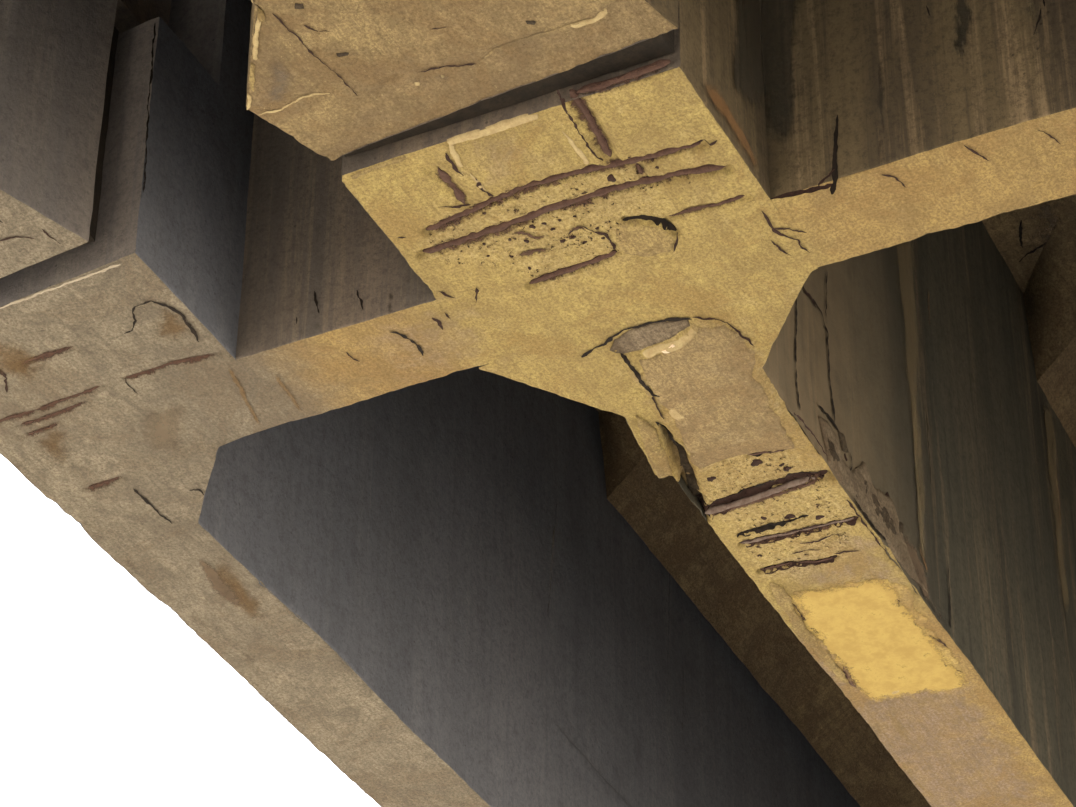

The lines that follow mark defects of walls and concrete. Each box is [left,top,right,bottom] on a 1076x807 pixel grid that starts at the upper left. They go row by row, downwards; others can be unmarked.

crack [272,13,357,96]
spalling [350,155,408,179]
corrosion [437,153,493,205]
spalling [422,59,726,257]
crack [761,115,839,255]
corrosion [514,231,547,257]
spalling [528,195,745,284]
crack [124,301,199,342]
crack [794,276,835,455]
crack [134,489,172,523]
crack [792,500,886,554]
peeling [817,638,857,688]